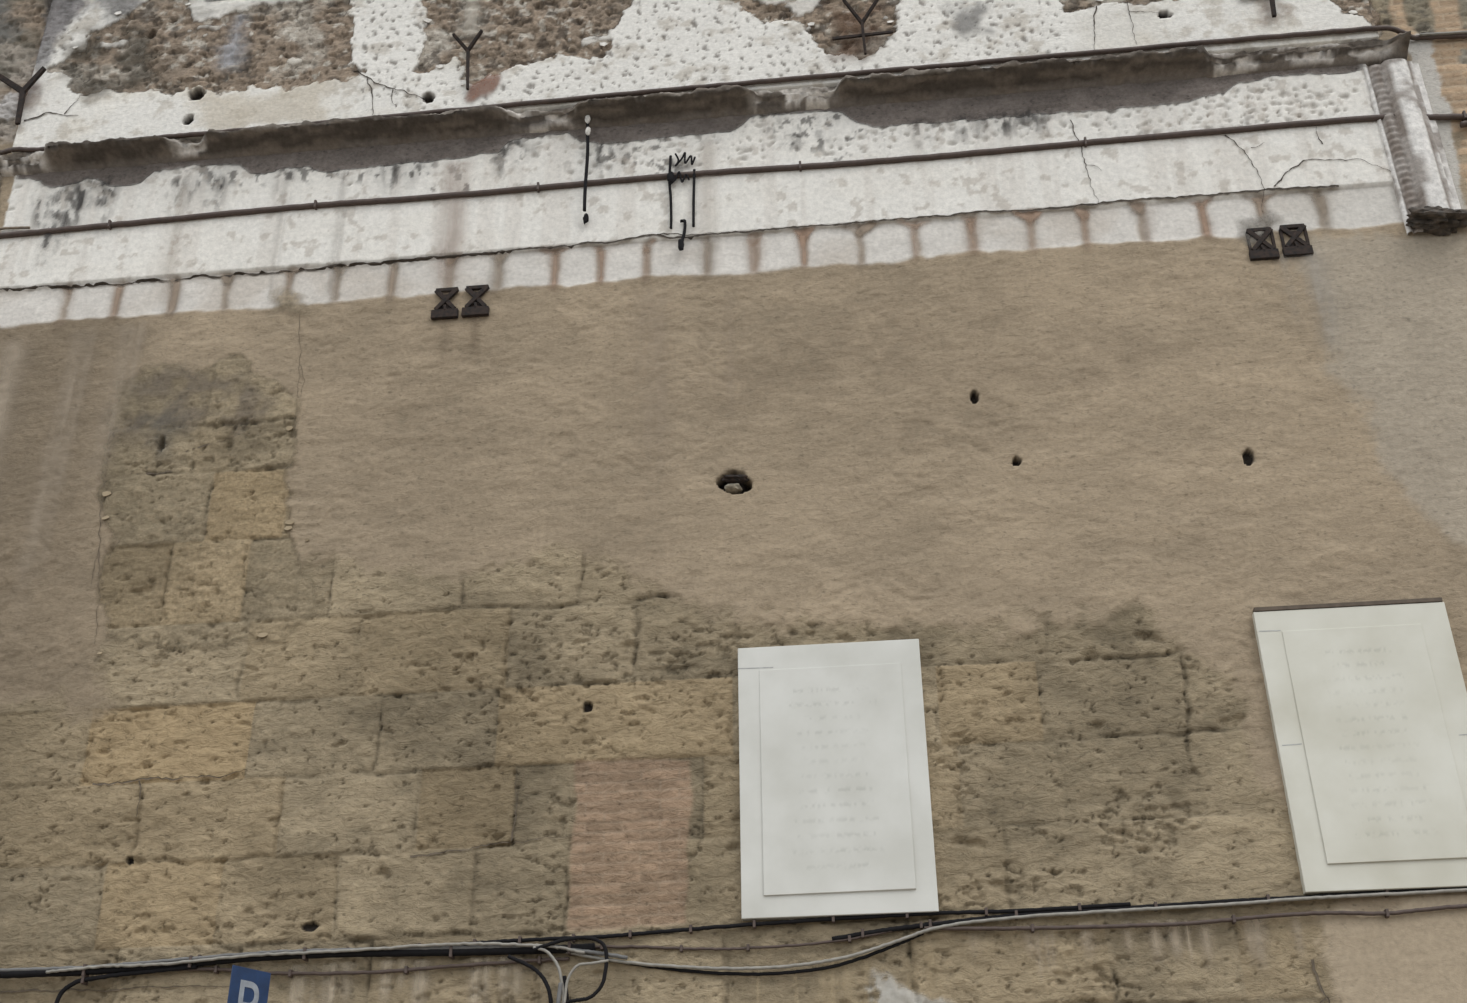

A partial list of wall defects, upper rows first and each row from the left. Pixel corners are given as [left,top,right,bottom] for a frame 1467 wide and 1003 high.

spalling [47,0,367,96]
spalling [413,0,634,86]
spalling [730,0,900,60]
spalling [1059,0,1178,13]
spalling [1330,0,1382,37]
leakage [36,181,115,247]
crack [0,120,1390,291]
rust [794,227,814,265]
rust [844,222,877,237]
rust [541,248,566,287]
rust [168,278,181,313]
leakage [877,978,943,1003]